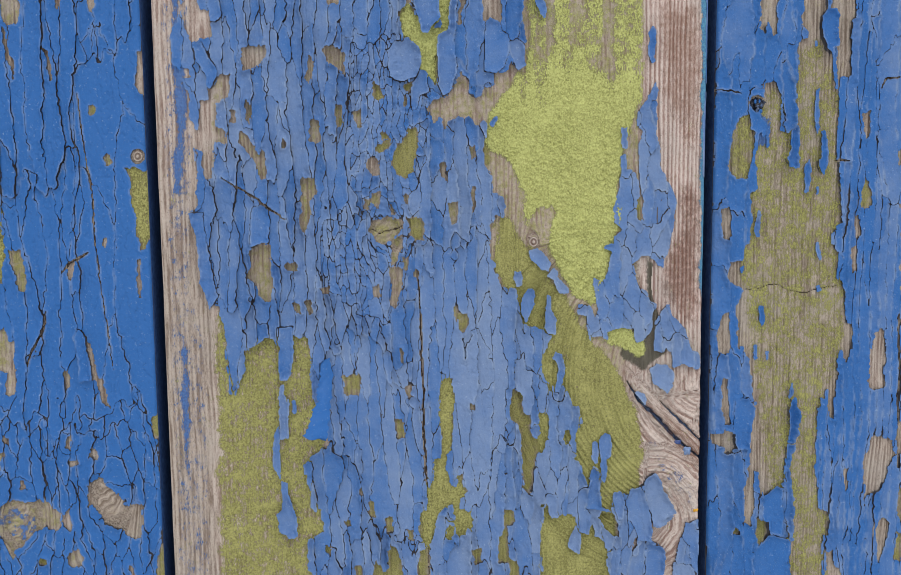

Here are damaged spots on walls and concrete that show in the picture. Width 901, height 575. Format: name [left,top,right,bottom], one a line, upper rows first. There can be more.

peeling [0,0,165,575]
crack [63,98,113,363]
crack [418,273,430,526]
peeling [151,0,708,575]
peeling [706,0,901,575]